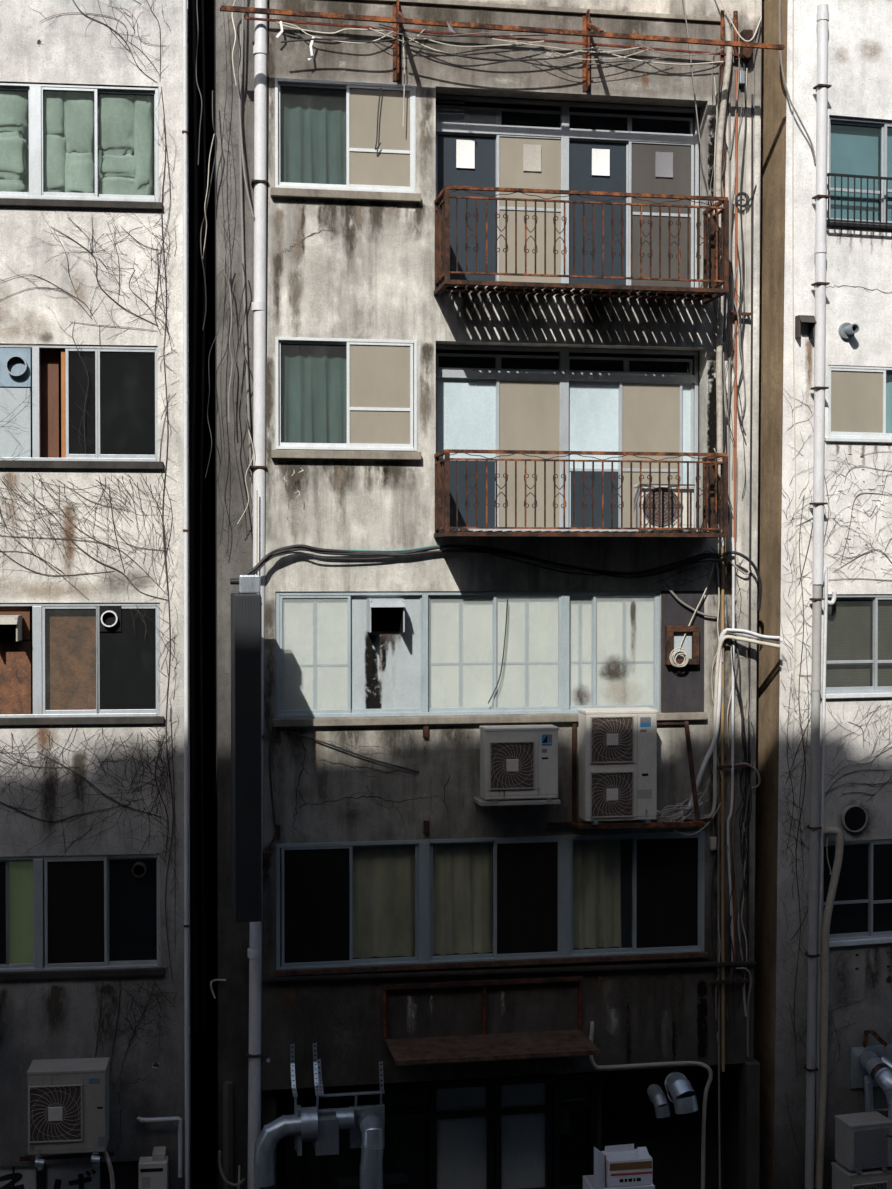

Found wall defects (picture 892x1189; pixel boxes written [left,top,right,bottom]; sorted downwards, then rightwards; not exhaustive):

damp [274,200,424,318]
damp [604,970,717,1063]